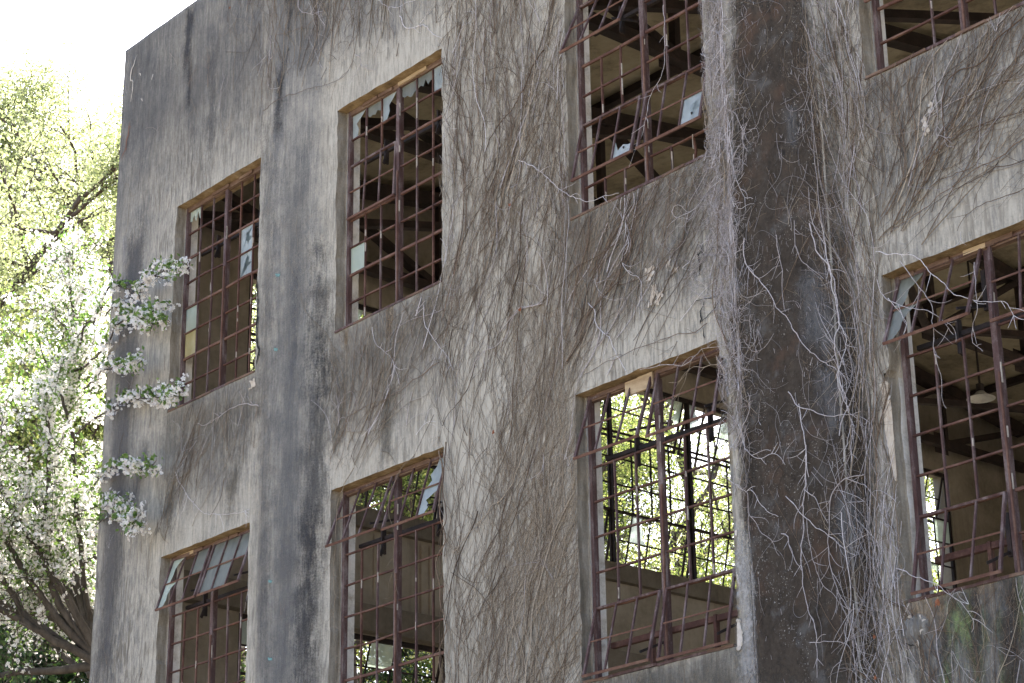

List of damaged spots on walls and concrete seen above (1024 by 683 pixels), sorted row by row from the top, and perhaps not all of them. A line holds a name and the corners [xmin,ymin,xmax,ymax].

water stain [183,9,193,103]
water stain [297,290,329,683]
water stain [637,0,880,683]